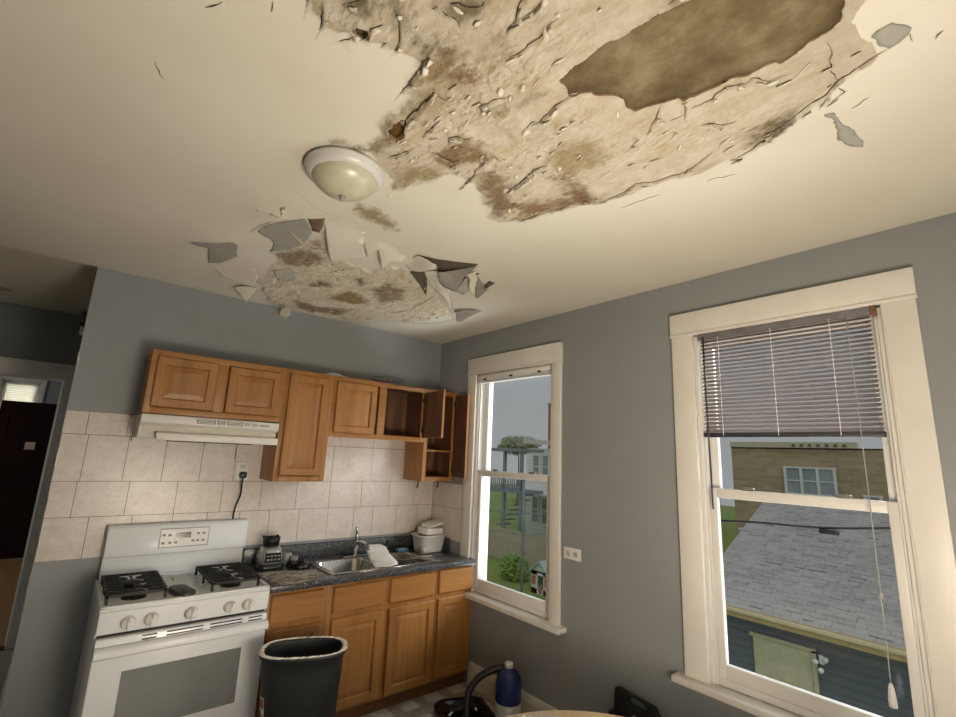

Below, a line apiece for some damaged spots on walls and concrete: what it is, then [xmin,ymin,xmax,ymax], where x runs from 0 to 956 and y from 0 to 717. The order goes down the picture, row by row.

spalling [151,0,949,325]